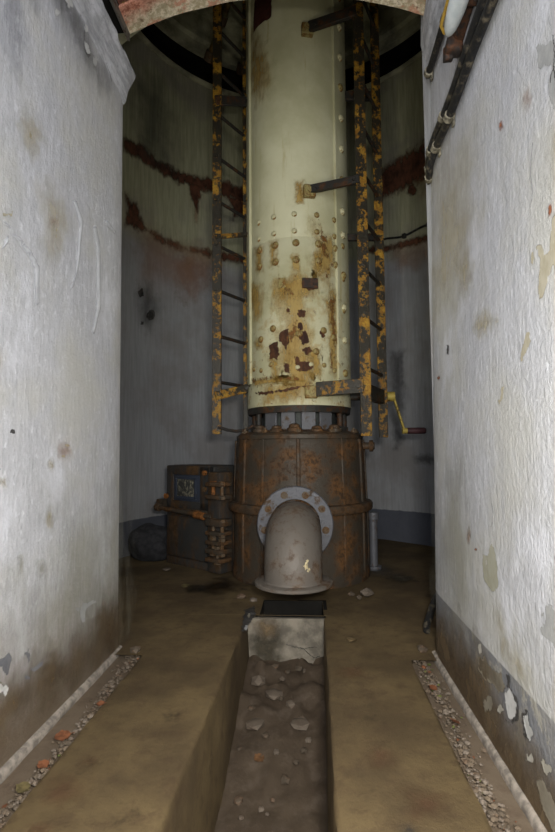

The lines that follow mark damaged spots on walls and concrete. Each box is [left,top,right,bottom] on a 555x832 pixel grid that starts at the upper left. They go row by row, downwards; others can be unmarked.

rust [123,138,243,217]
rust [382,141,426,197]
peeling [531,215,555,298]
peeling [482,544,498,591]
peeling [541,605,555,647]
peeling [0,653,12,696]
peeling [478,643,533,741]
peeling [526,753,555,832]